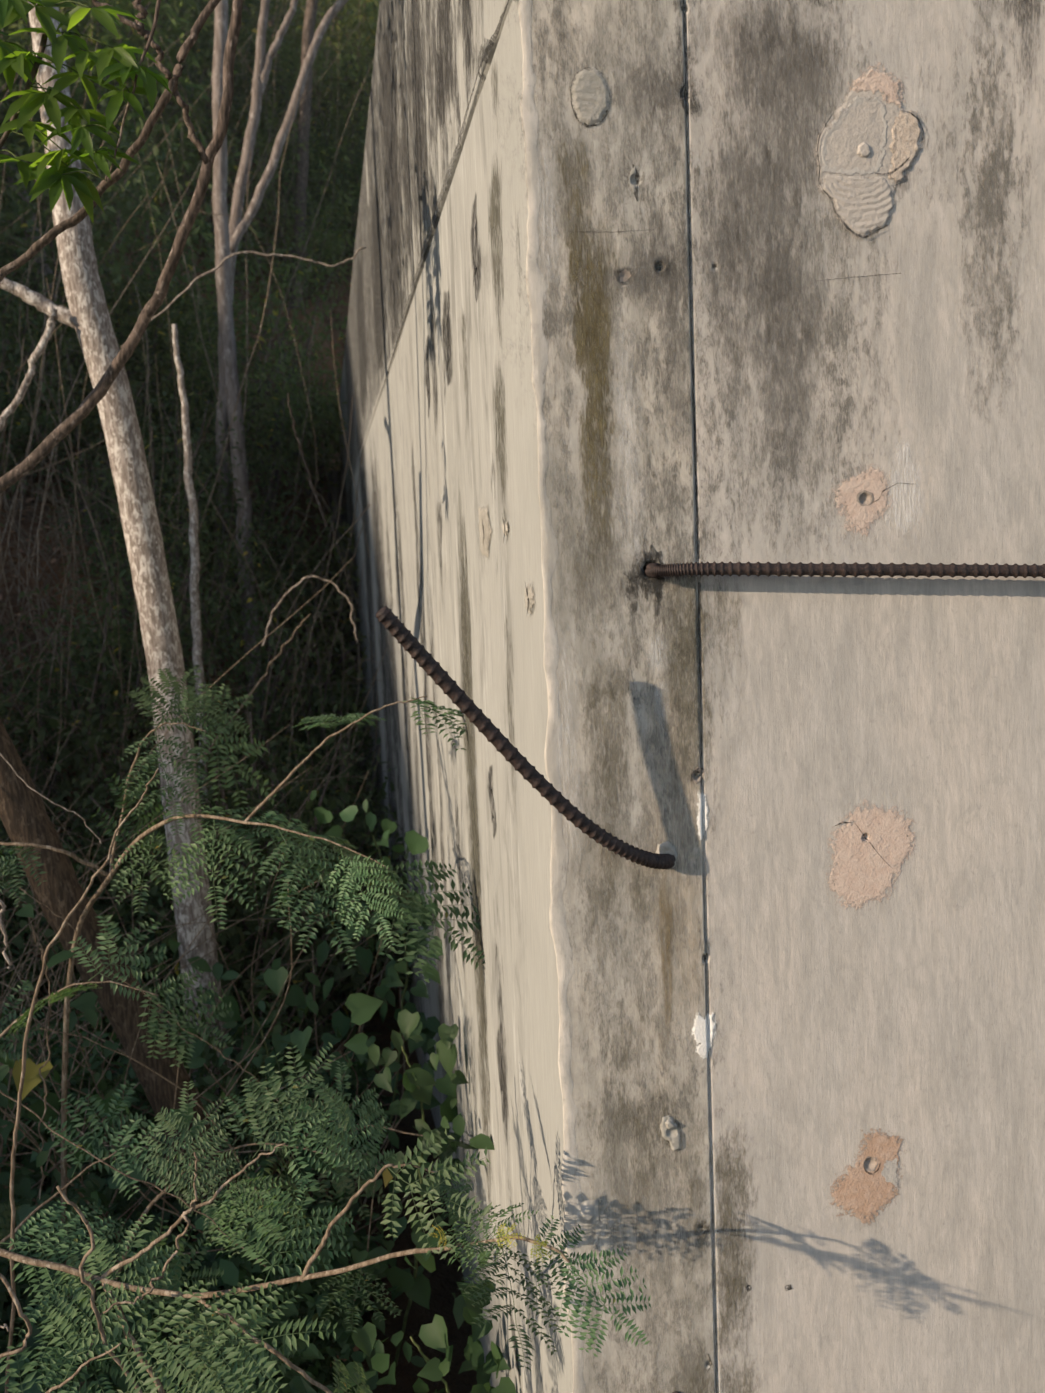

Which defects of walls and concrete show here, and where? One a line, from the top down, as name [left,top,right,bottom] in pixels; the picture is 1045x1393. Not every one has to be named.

leakage [489,167,518,302]
spalling [814,61,925,239]
leakage [965,74,1013,362]
leakage [341,0,508,1198]
leakage [538,0,873,1071]
spalling [829,463,910,540]
spalling [826,799,918,910]
leakage [596,1082,753,1393]
spalling [828,1128,905,1226]